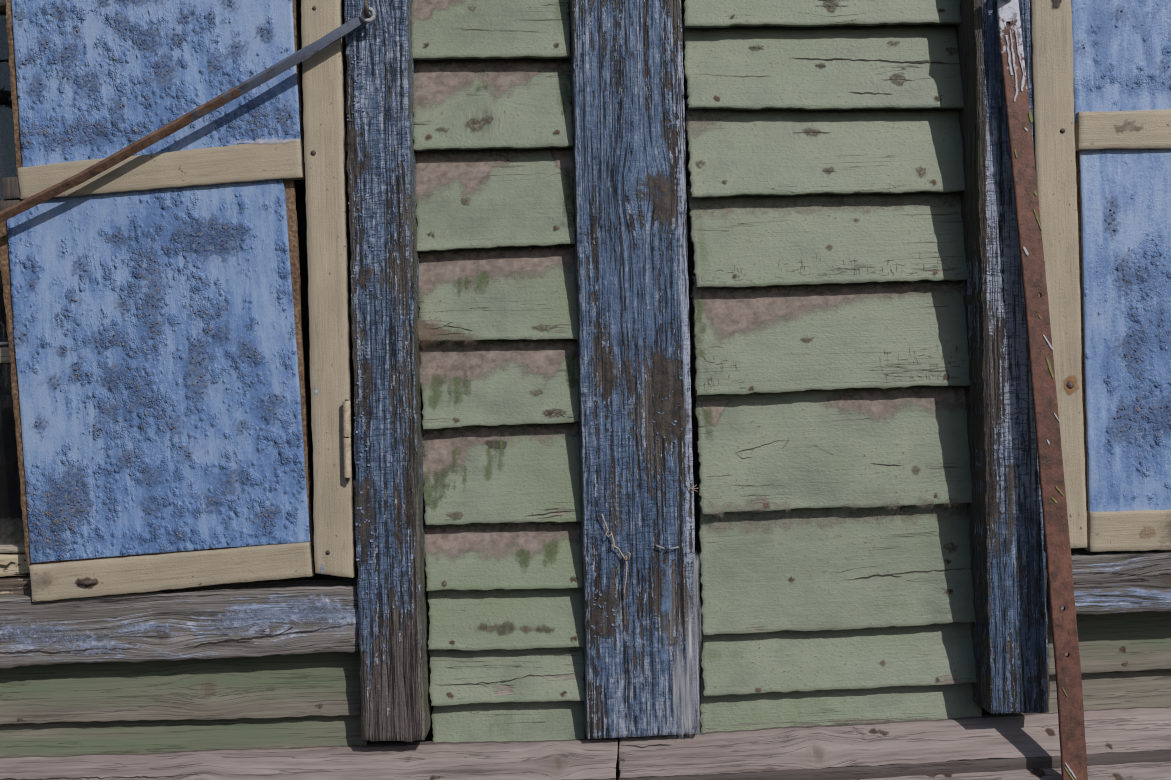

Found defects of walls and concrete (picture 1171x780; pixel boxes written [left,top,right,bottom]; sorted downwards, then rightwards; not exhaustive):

peeling [414,58,571,107]
peeling [415,149,525,199]
peeling [551,148,574,226]
peeling [419,244,575,293]
peeling [695,281,964,338]
peeling [417,321,577,406]
peeling [649,351,689,443]
peeling [827,386,966,419]
peeling [354,337,374,592]
peeling [393,422,578,541]
peeling [424,522,581,567]
peeling [589,590,617,637]